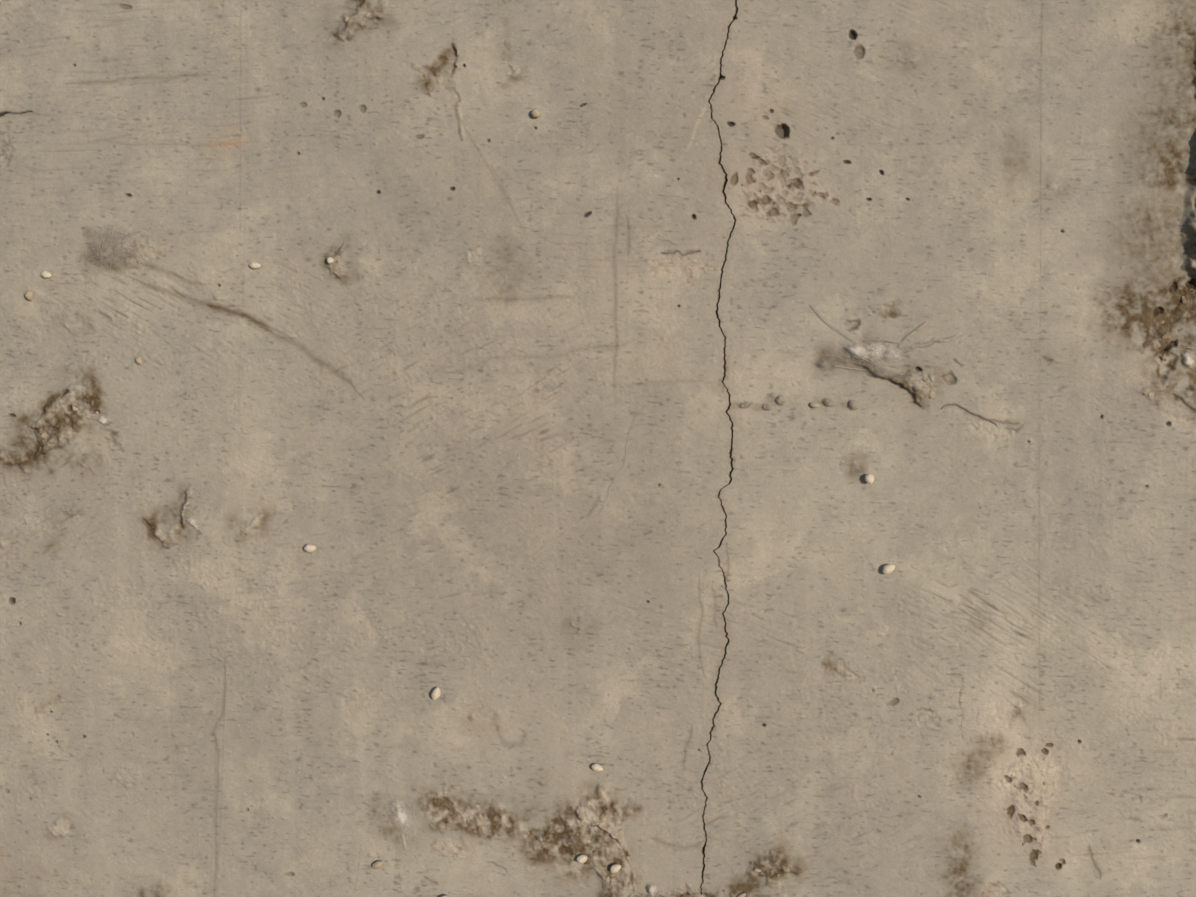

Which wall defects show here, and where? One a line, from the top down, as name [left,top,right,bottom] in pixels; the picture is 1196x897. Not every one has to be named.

spalling [410,37,466,143]
spalling [1134,272,1196,385]
crack [389,0,738,895]
spalling [632,881,725,897]